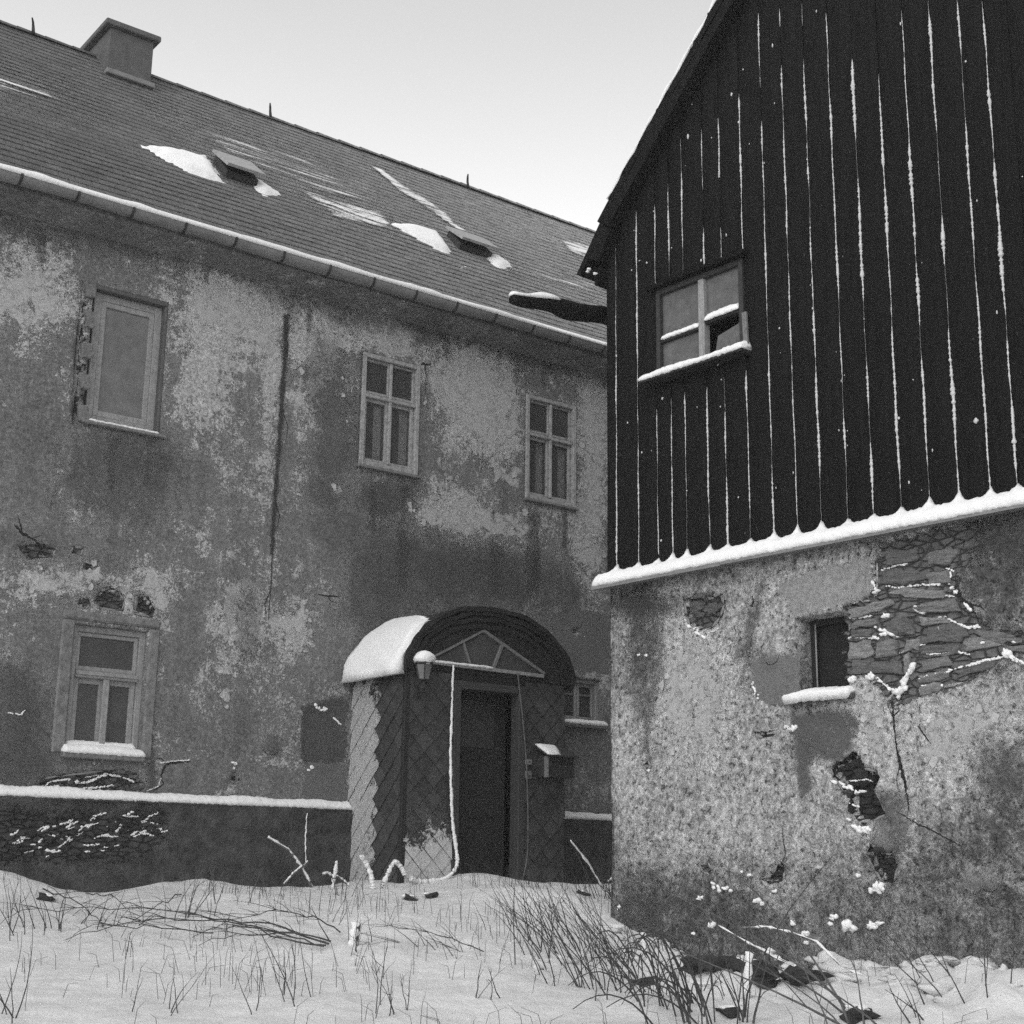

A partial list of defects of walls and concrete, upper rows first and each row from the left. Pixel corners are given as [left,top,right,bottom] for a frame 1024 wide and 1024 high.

crack [264,314,289,620]
peeling [19,544,169,617]
peeling [657,591,728,755]
spalling [830,523,1024,825]
water stain [791,711,858,796]
crack [888,701,960,846]
spalling [868,843,898,883]